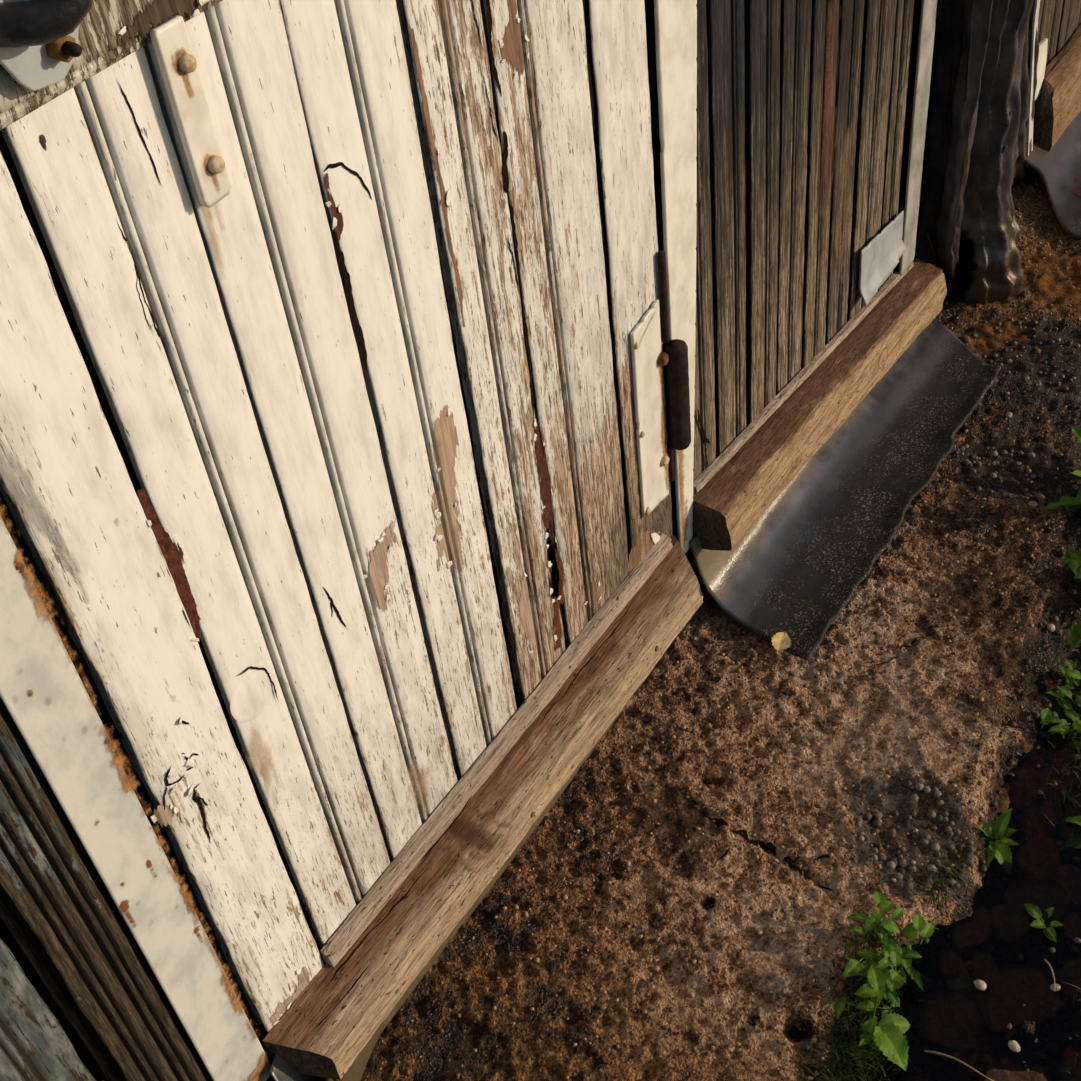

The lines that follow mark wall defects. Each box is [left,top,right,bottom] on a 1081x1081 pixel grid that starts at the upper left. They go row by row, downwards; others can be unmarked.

corrosion [173,51,194,96]
peeling [499,0,529,79]
crack [323,162,372,199]
crack [335,232,368,373]
peeling [431,404,463,573]
peeling [362,524,397,612]
crack [686,800,833,891]